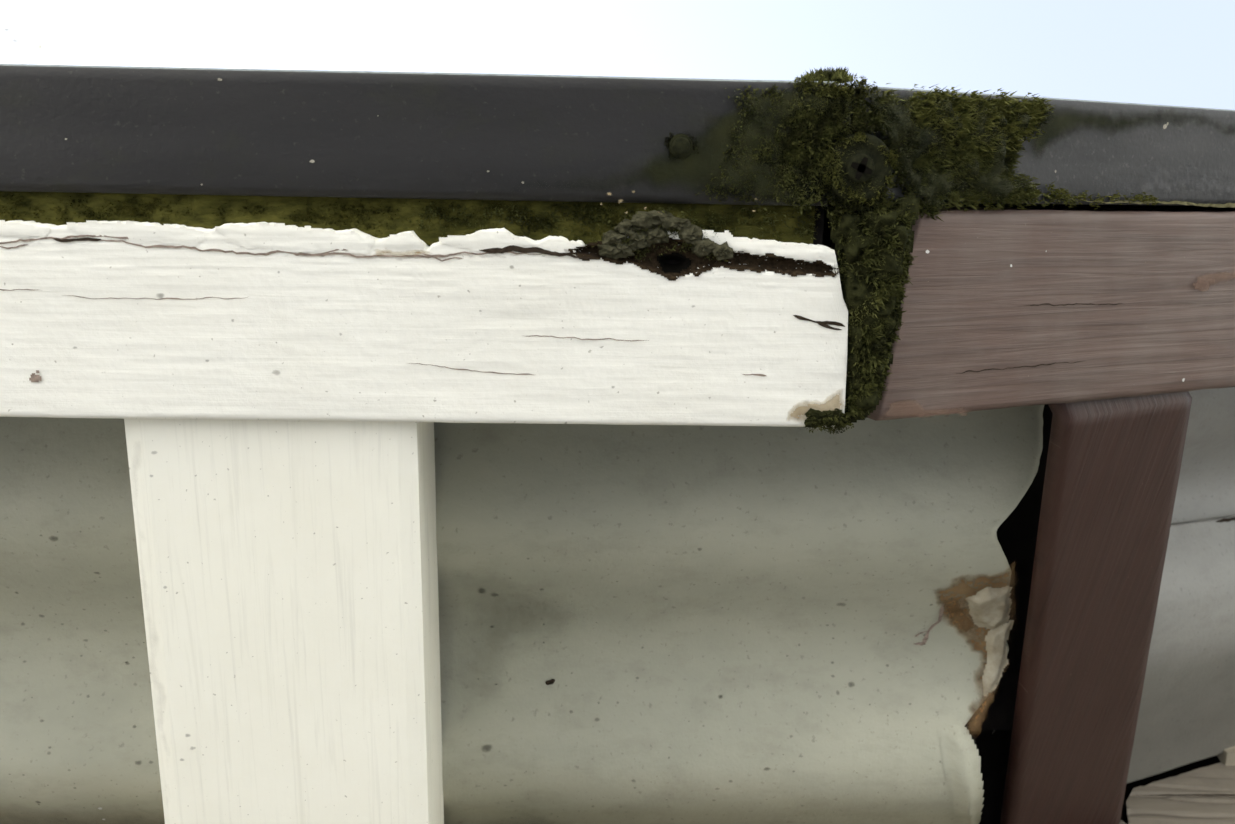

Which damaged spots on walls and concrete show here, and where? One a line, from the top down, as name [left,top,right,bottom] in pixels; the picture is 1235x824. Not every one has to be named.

peeling [0,220,50,238]
peeling [67,220,598,259]
peeling [702,230,836,261]
leakage [790,394,854,435]